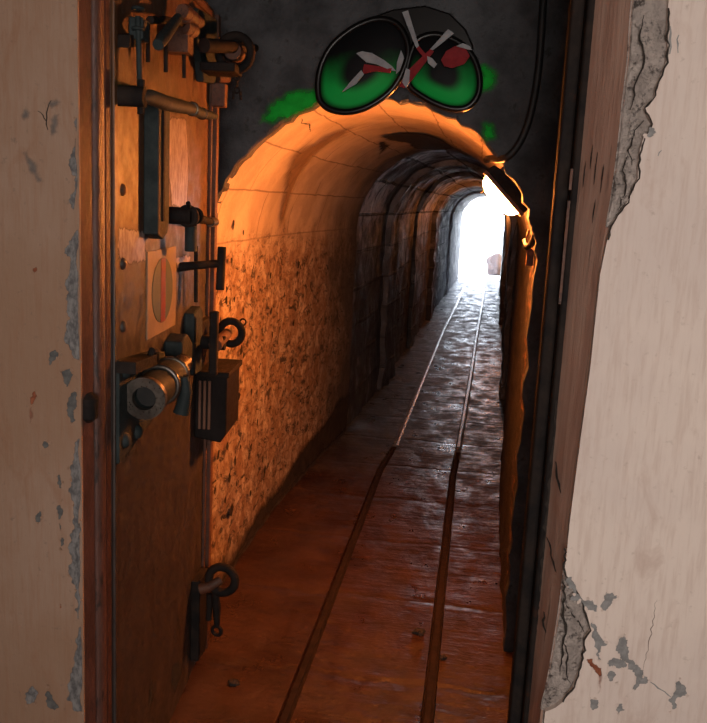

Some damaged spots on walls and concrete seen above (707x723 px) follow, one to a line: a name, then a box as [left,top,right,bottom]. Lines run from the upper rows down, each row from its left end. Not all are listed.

peeling [69,139,78,209]
spalling [605,0,670,240]
peeling [59,230,82,426]
peeling [56,434,83,618]
peeling [67,627,85,714]
spalling [541,548,648,710]
peeling [669,678,689,714]